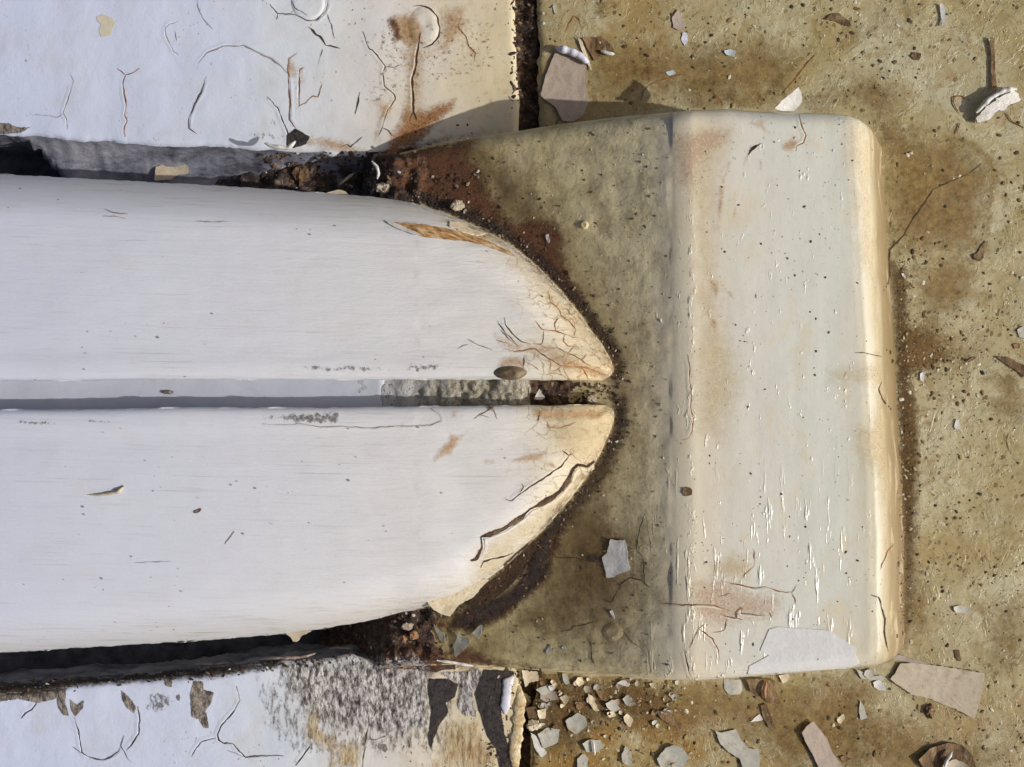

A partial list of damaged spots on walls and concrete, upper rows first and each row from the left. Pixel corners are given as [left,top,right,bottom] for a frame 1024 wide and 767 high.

crack [161,0,476,147]
spalling [286,129,309,148]
corrosion [380,15,589,319]
crack [458,295,602,378]
crack [471,410,600,567]
crack [560,510,797,678]
peeling [0,689,84,716]
crack [71,706,140,764]
peeling [122,677,214,728]
crack [188,686,310,765]
peeling [263,653,513,767]
peeling [724,627,985,730]